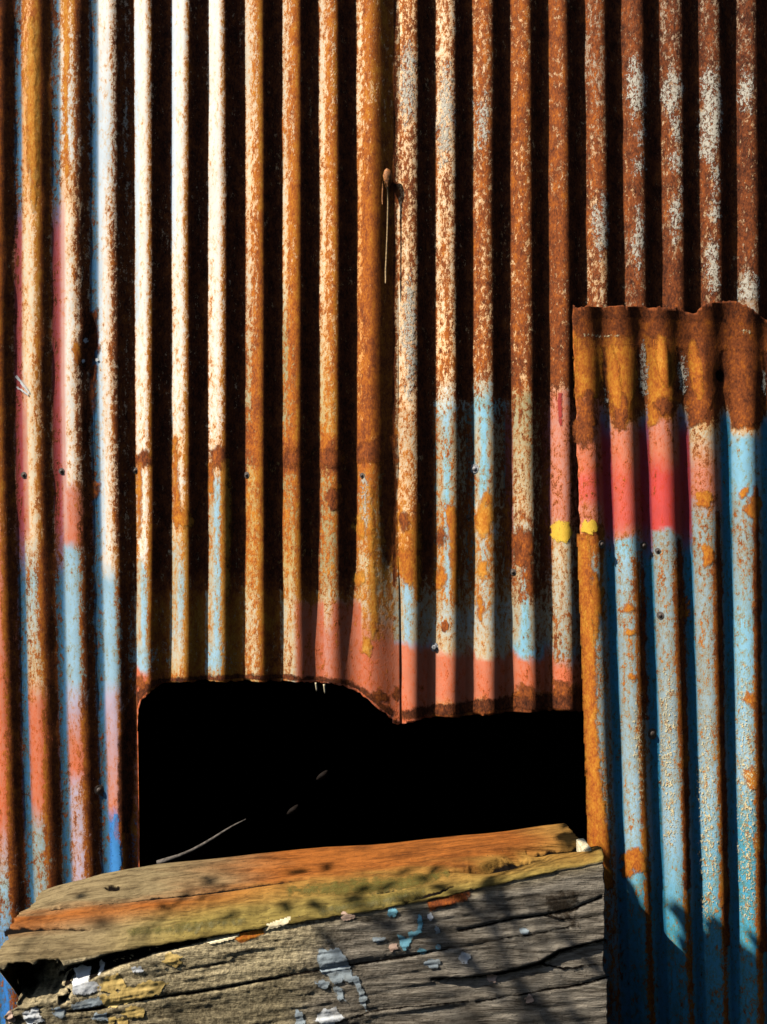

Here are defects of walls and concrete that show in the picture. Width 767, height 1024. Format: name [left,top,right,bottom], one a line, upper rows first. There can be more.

rust [71,306,101,449]
peeling [638,340,649,396]
rust [557,316,767,448]
peeling [677,355,689,395]
rust [171,436,194,529]
rust [207,445,232,603]
rust [283,434,459,658]
rust [473,487,494,539]
rust [117,525,649,890]
rust [677,538,692,889]
rust [695,490,730,947]
rust [738,485,767,953]